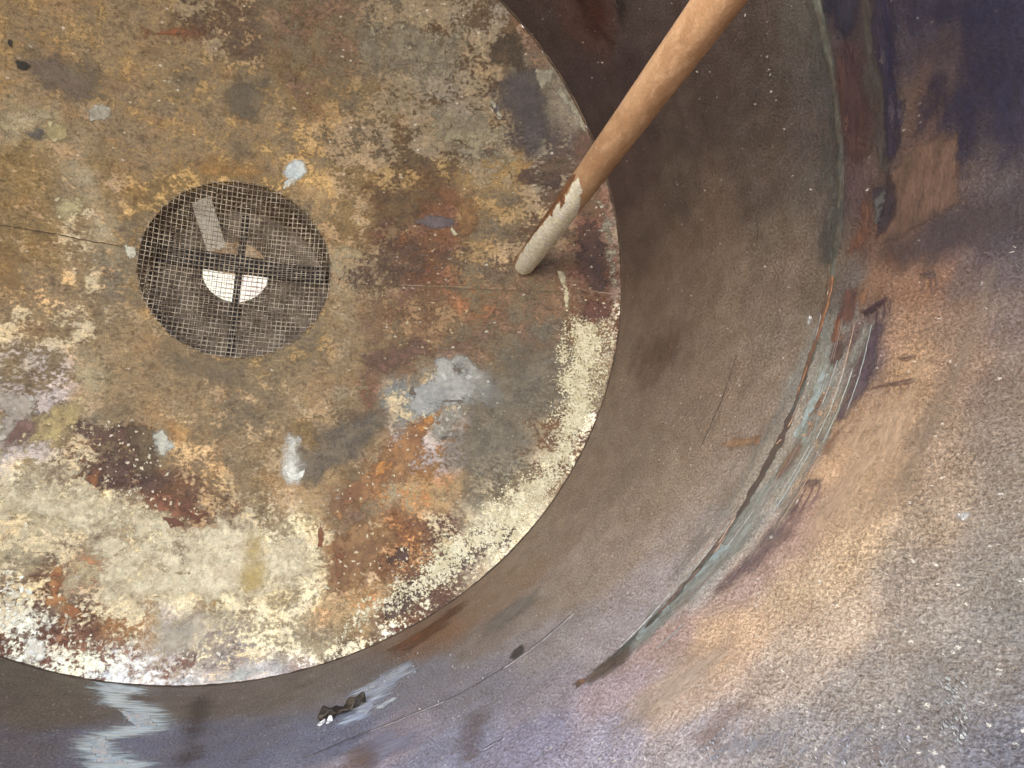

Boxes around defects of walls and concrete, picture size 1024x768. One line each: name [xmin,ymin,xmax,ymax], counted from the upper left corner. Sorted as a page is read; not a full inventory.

spalling [16,48,111,122]
crack [0,225,121,249]
corrosion [334,230,478,350]
corrosion [829,287,867,365]
corrosion [74,414,209,528]
peeling [0,376,314,627]
corrosion [317,410,444,599]
peeling [323,271,616,658]
corrosion [775,388,830,478]
corrosion [38,564,223,679]